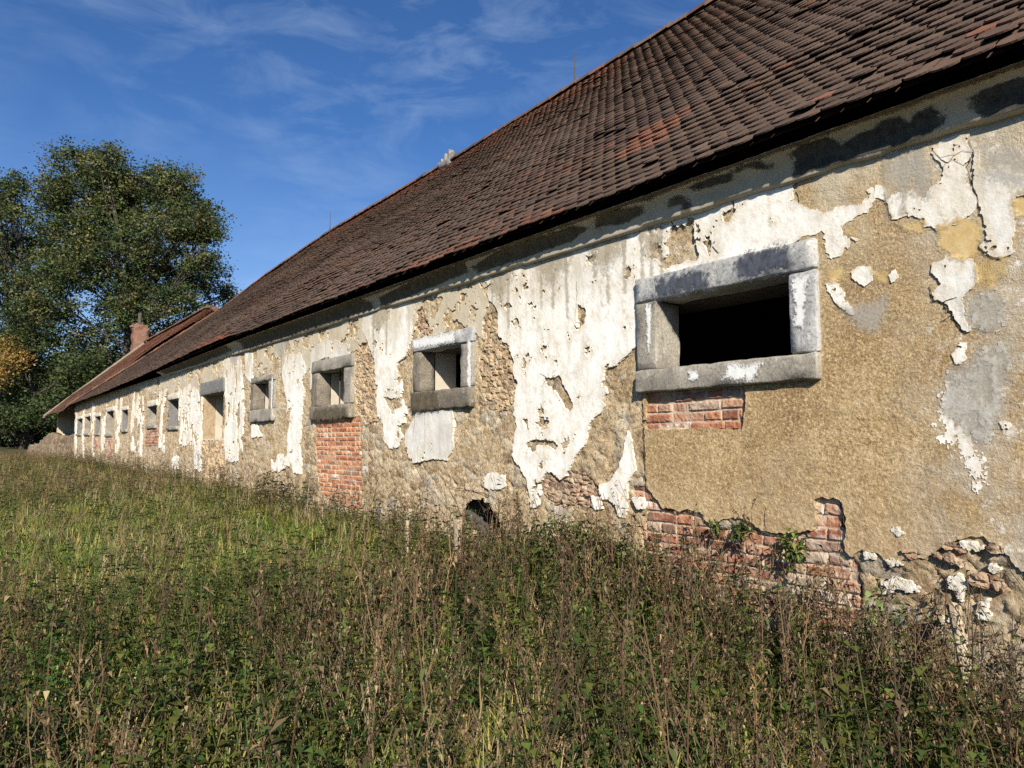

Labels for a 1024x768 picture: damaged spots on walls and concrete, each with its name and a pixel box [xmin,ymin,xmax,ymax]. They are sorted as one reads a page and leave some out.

peeling [74,134,1024,508]
water stain [159,61,1024,408]
flaking render [591,431,862,638]
flaking render [901,542,1007,593]